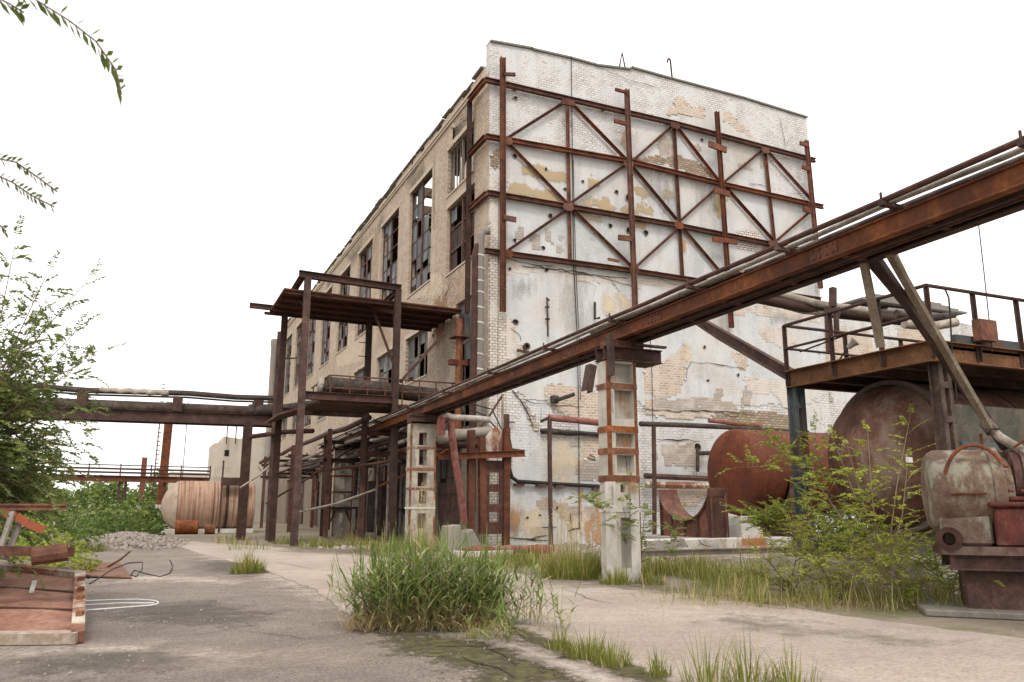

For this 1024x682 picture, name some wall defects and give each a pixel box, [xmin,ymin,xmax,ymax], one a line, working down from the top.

flaking render [667,96,706,119]
flaking render [643,343,789,429]